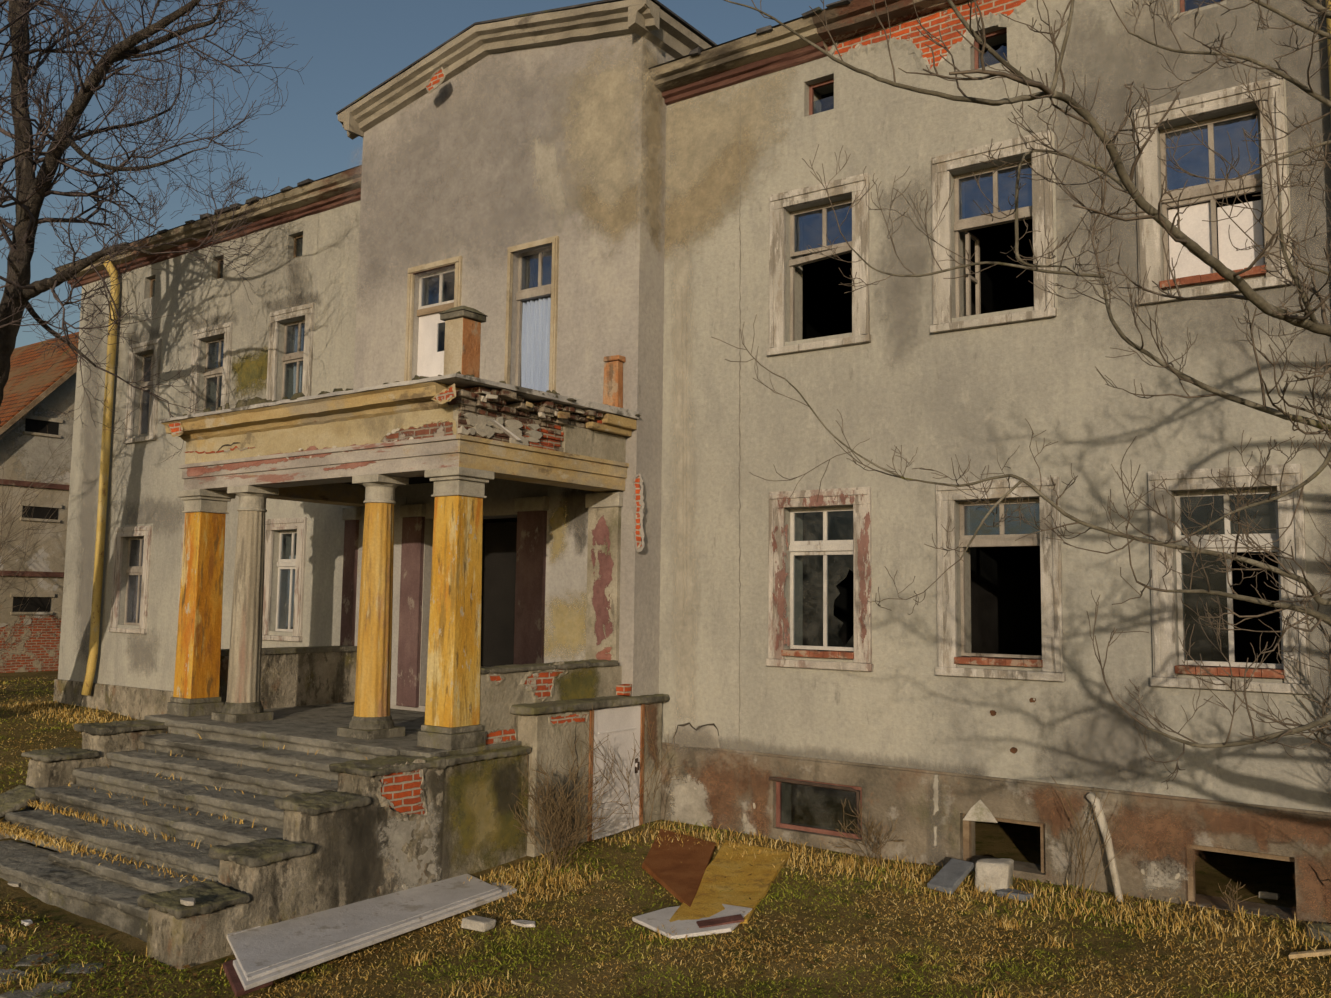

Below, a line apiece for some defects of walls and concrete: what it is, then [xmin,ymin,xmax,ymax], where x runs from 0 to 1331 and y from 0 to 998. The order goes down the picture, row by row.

flaking render [426,67,445,94]
flaking render [825,0,1037,78]
leakage [372,41,779,717]
flaking render [187,383,604,477]
flaking render [632,474,645,552]
peeling [591,515,614,660]
peeling [772,524,790,651]
peeling [777,494,871,643]
flaking render [0,614,62,673]
flaking render [486,661,589,727]
flaking render [373,759,441,892]